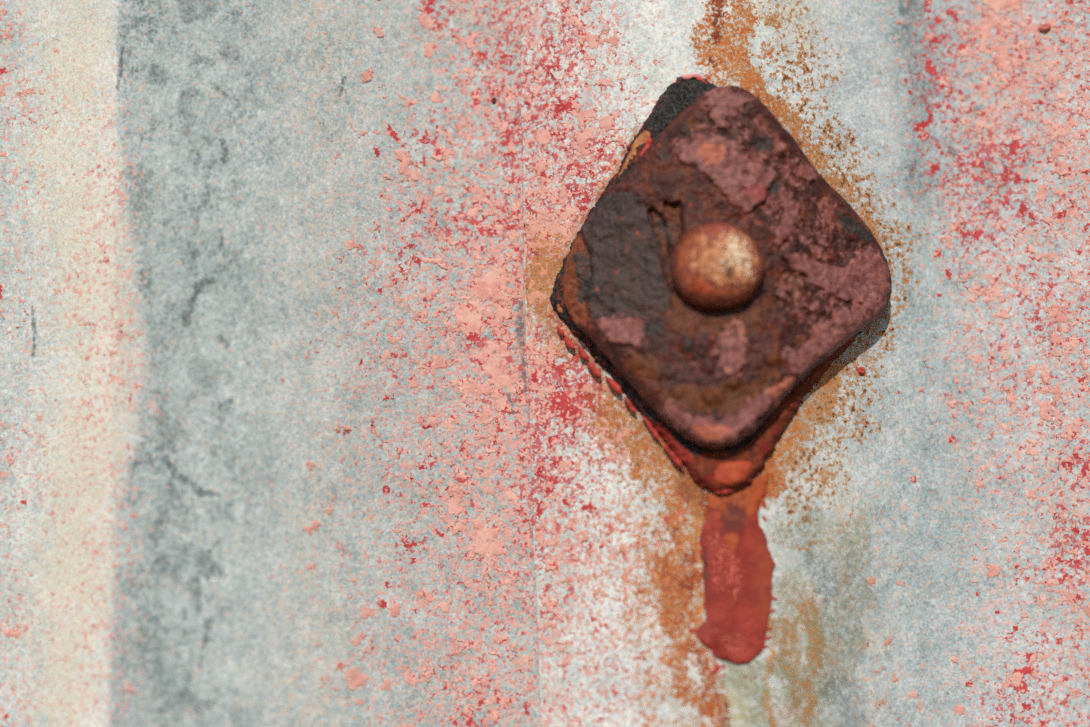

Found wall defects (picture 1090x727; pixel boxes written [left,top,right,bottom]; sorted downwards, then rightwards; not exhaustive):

peeling [0,63,59,138]
peeling [0,272,32,348]
peeling [44,302,156,411]
peeling [278,0,693,727]
rust [524,0,924,727]
peeling [892,0,1090,727]
peeling [0,410,65,479]
peeling [1,603,69,642]
peeling [867,636,899,682]